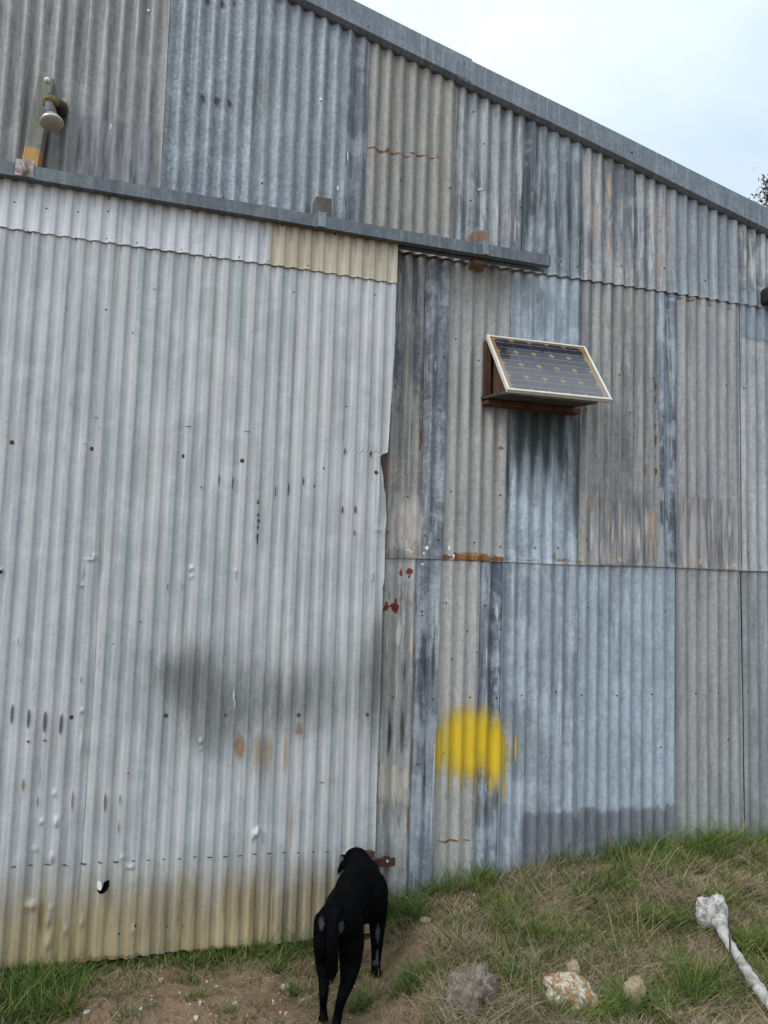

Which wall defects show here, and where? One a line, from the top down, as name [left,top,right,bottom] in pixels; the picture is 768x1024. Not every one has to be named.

rust [368,146,439,159]
water stain [507,410,739,571]
rust [442,552,504,562]